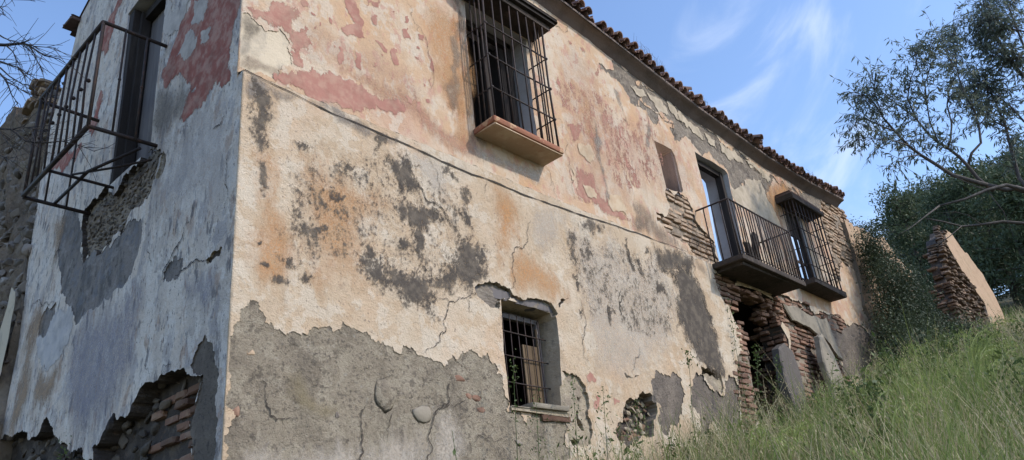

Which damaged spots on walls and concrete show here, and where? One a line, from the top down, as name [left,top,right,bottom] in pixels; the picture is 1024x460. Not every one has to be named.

peeling [161,0,434,122]
spalling [36,147,166,372]
crack [148,206,204,276]
leakage [261,104,495,322]
spalling [190,300,600,460]
crack [426,293,476,351]
crack [245,69,687,318]
leakage [568,204,725,379]
spalling [556,60,854,283]
flaking render [651,189,885,436]